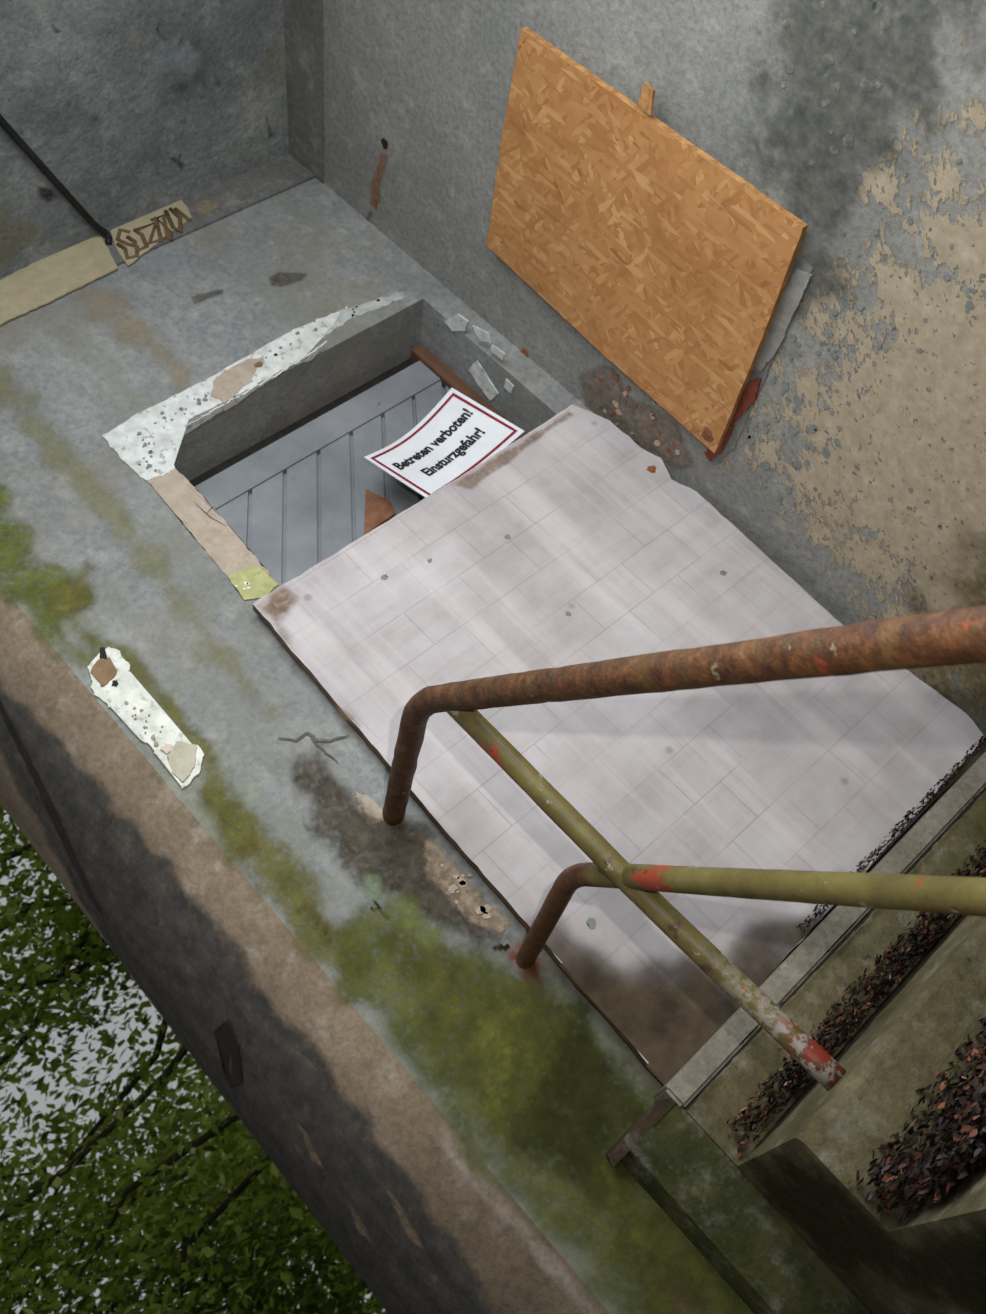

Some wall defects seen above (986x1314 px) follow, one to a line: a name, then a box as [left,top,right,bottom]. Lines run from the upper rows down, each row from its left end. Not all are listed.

rust [367,138,388,219]
damp [755,0,936,229]
peeling [581,96,986,620]
peeling [908,663,986,735]
damp [294,760,497,948]
flaking render [424,840,510,933]
damp [731,914,825,987]
damp [535,937,740,1195]